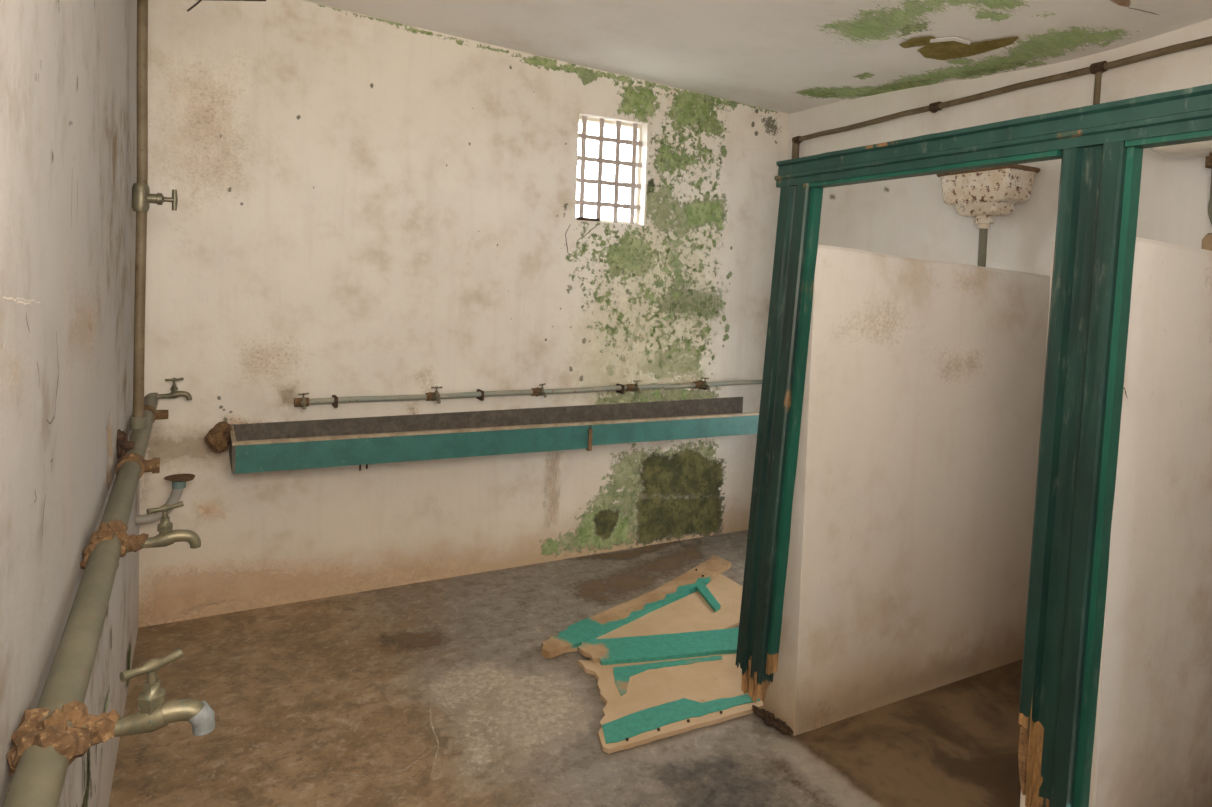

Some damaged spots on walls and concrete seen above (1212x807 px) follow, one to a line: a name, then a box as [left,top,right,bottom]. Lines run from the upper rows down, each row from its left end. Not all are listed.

mould [821,0,1024,45]
mould [796,13,1139,99]
leakage [317,4,781,405]
leakage [540,439,727,605]
leakage [660,756,787,807]